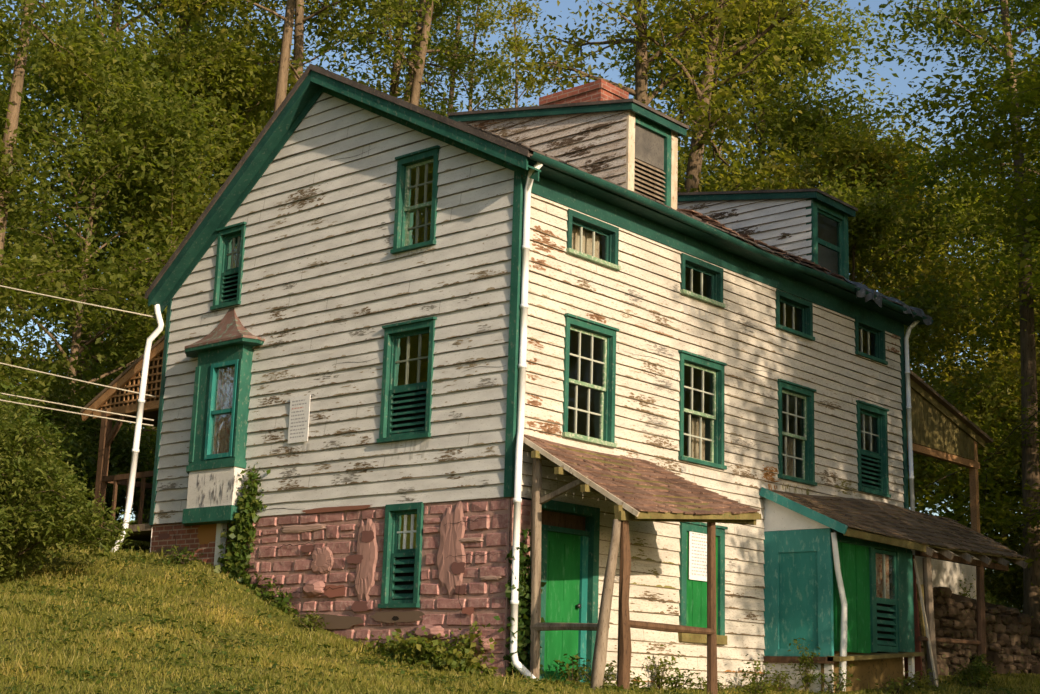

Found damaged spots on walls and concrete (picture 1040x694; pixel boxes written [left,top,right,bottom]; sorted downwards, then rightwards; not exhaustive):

peeling [547,121,616,180]
peeling [268,183,328,250]
peeling [685,203,761,234]
peeling [529,225,565,271]
peeling [527,340,543,381]
peeling [527,421,562,438]
peeling [620,341,683,475]
peeling [196,467,257,507]
peeling [261,429,303,490]
peeling [313,428,378,485]
peeling [433,448,488,488]
peeling [726,435,779,488]